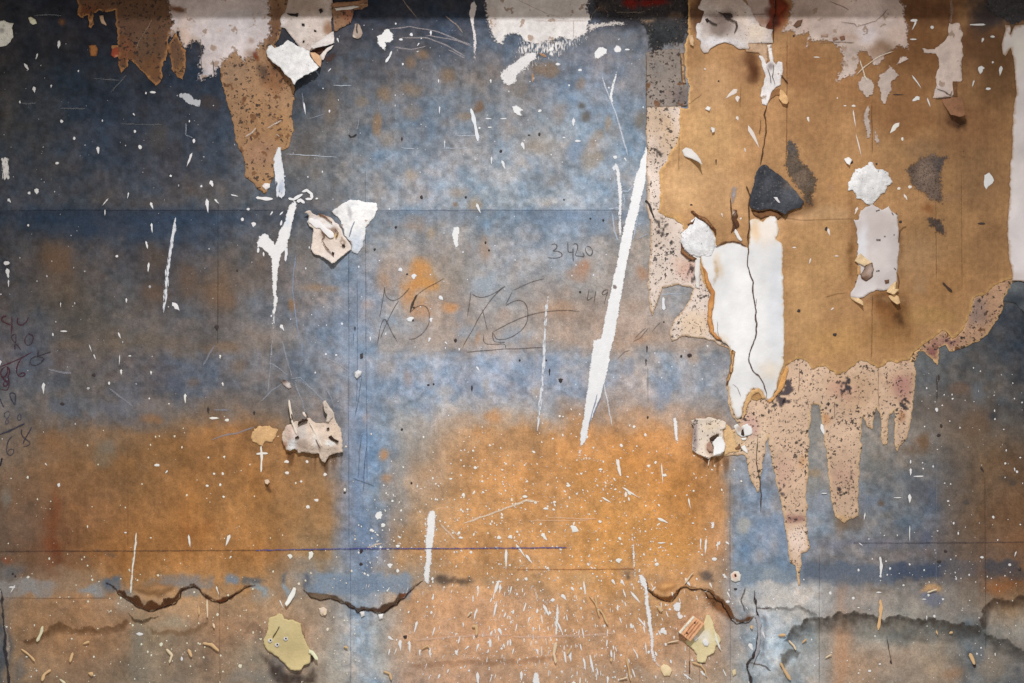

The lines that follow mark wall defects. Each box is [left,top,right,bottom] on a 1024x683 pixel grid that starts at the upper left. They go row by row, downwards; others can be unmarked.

spalling [353,23,363,39]
crack [759,106,767,164]
peeling [688,210,716,236]
peeling [855,253,872,275]
crack [730,187,767,398]
peeling [887,281,900,304]
spalling [734,424,753,454]
crack [106,583,254,612]
crack [304,581,422,615]
crack [646,582,771,683]
leakage [782,596,1024,664]